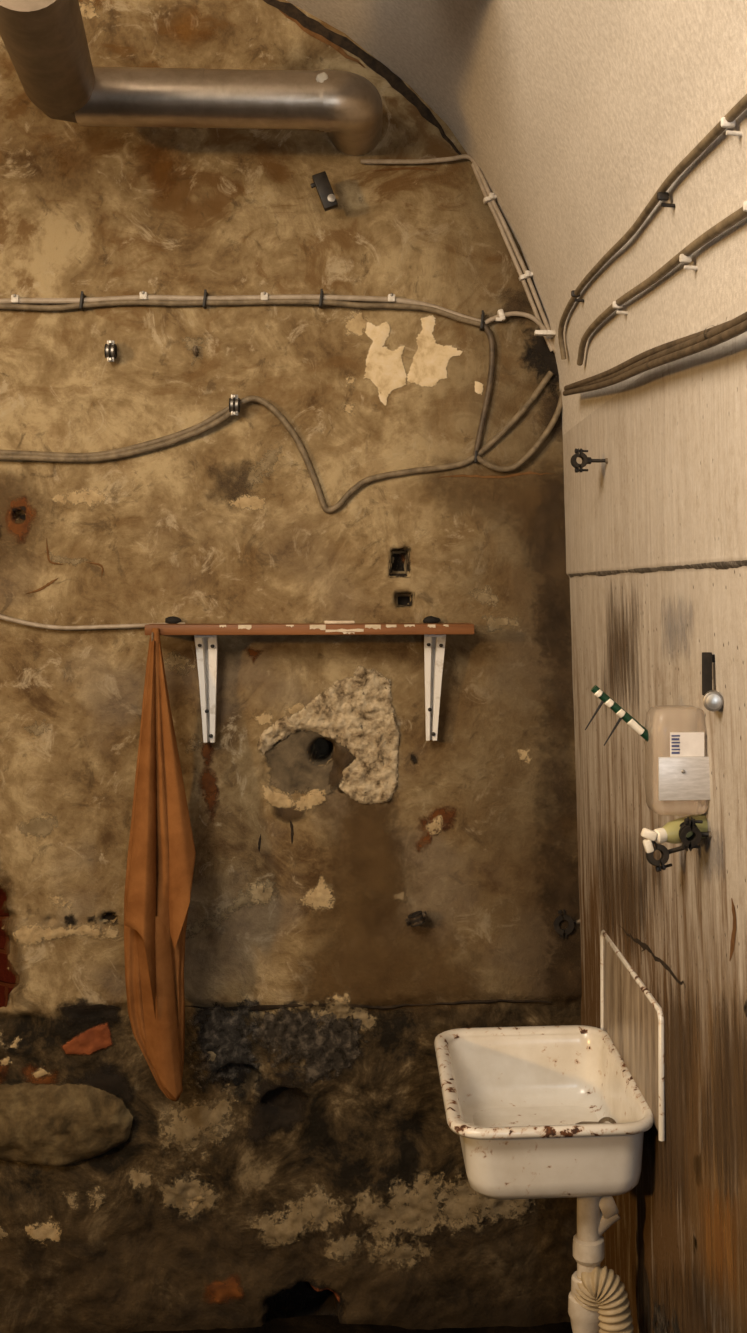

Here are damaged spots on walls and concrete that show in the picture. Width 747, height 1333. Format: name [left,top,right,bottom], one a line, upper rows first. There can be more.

peeling [342,311,462,405]
flaking render [256,666,417,822]
spalling [263,1279,344,1324]